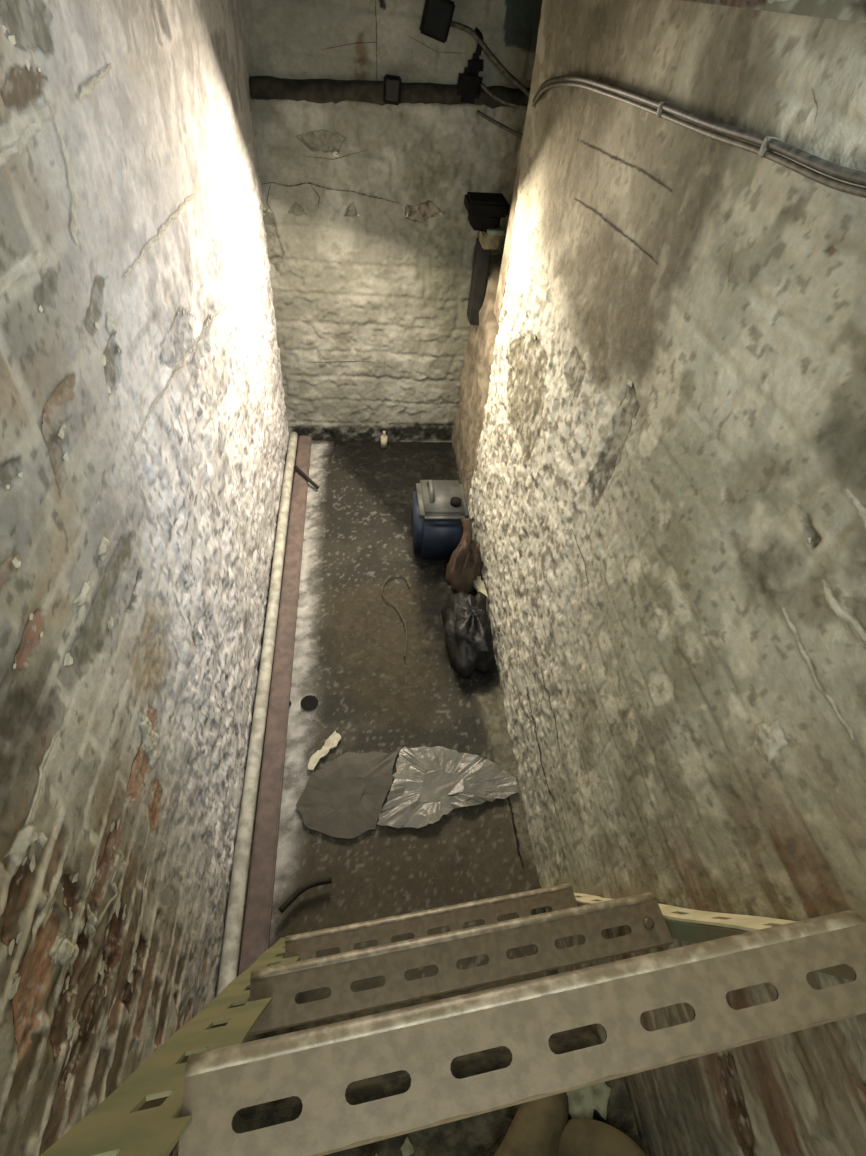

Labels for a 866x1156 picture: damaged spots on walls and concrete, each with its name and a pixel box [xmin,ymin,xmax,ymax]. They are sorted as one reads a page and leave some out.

flaking render [0,0,54,165]
peeling [0,251,58,312]
flaking render [86,276,121,394]
flaking render [0,457,23,489]
flaking render [41,373,75,495]
flaking render [0,554,21,588]
spalling [13,608,44,670]
flaking render [64,532,141,678]
spalling [2,705,163,1091]